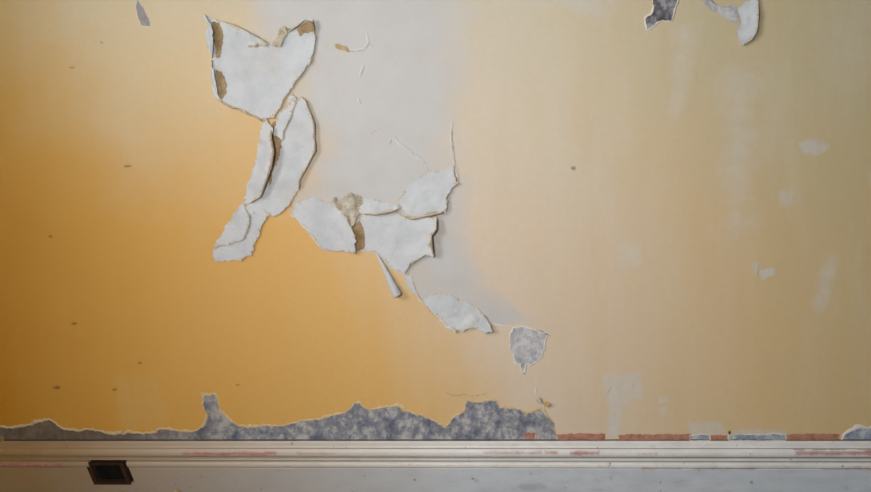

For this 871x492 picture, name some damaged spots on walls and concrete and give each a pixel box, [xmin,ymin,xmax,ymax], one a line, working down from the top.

flaking render [135,0,151,27]
flaking render [644,0,679,30]
peeling [702,0,759,46]
peeling [203,0,553,373]
flaking render [0,387,557,457]
flaking render [728,432,786,441]
peeling [793,424,871,471]